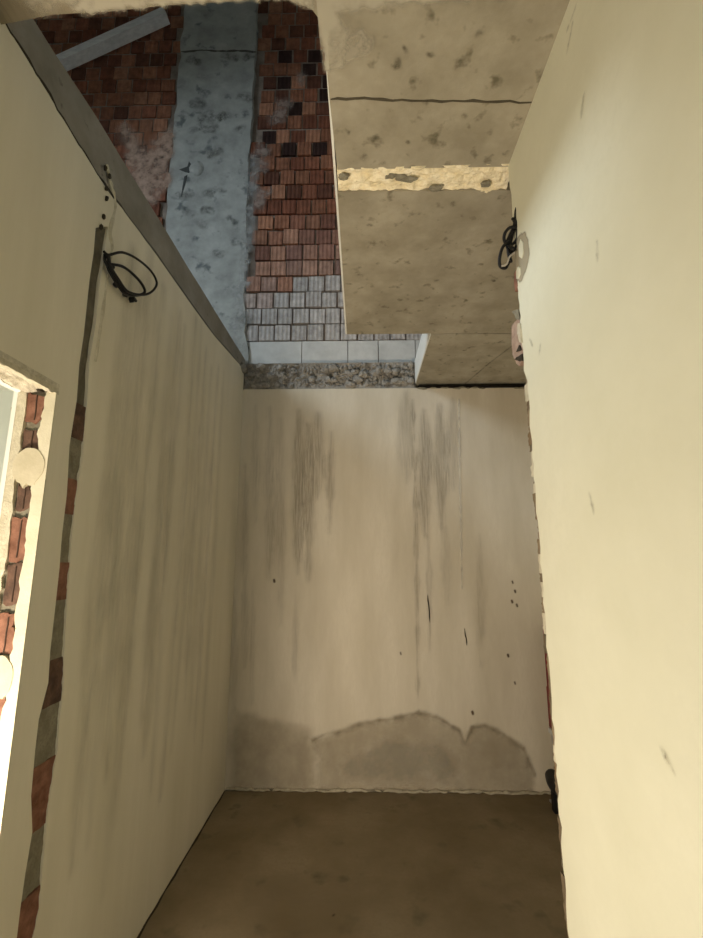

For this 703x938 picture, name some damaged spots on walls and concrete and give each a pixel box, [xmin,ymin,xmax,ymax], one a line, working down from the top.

crack [331,96,532,104]